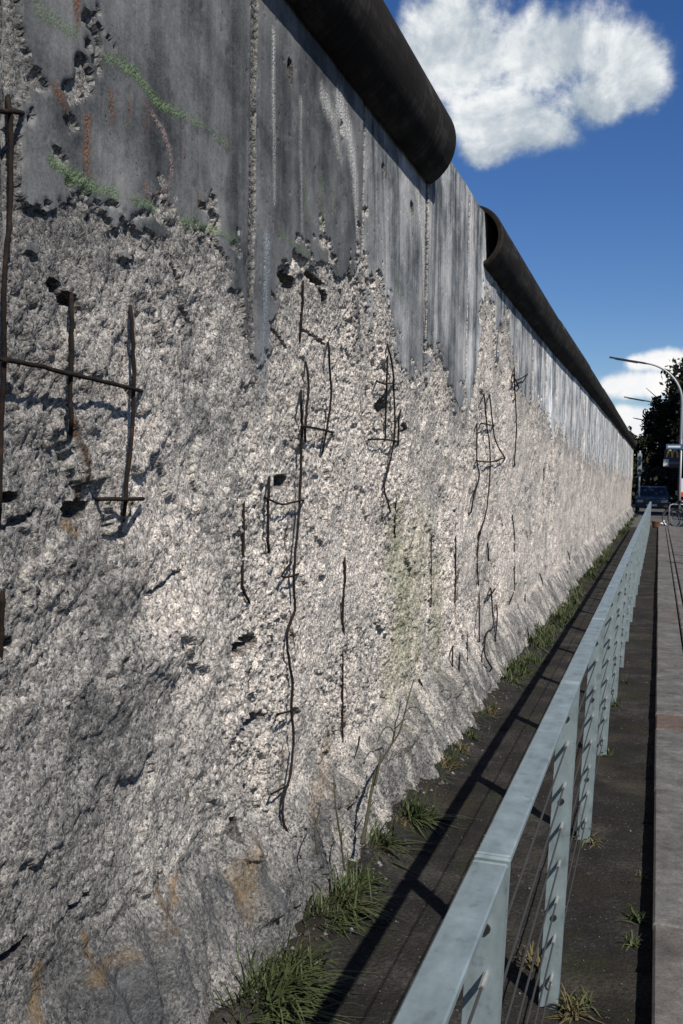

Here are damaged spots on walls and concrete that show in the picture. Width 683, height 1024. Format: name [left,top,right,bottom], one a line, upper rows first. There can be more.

corrosion [73,419,92,501]
spalling [0,0,282,1024]
water stain [322,93,356,199]
spalling [228,213,635,950]